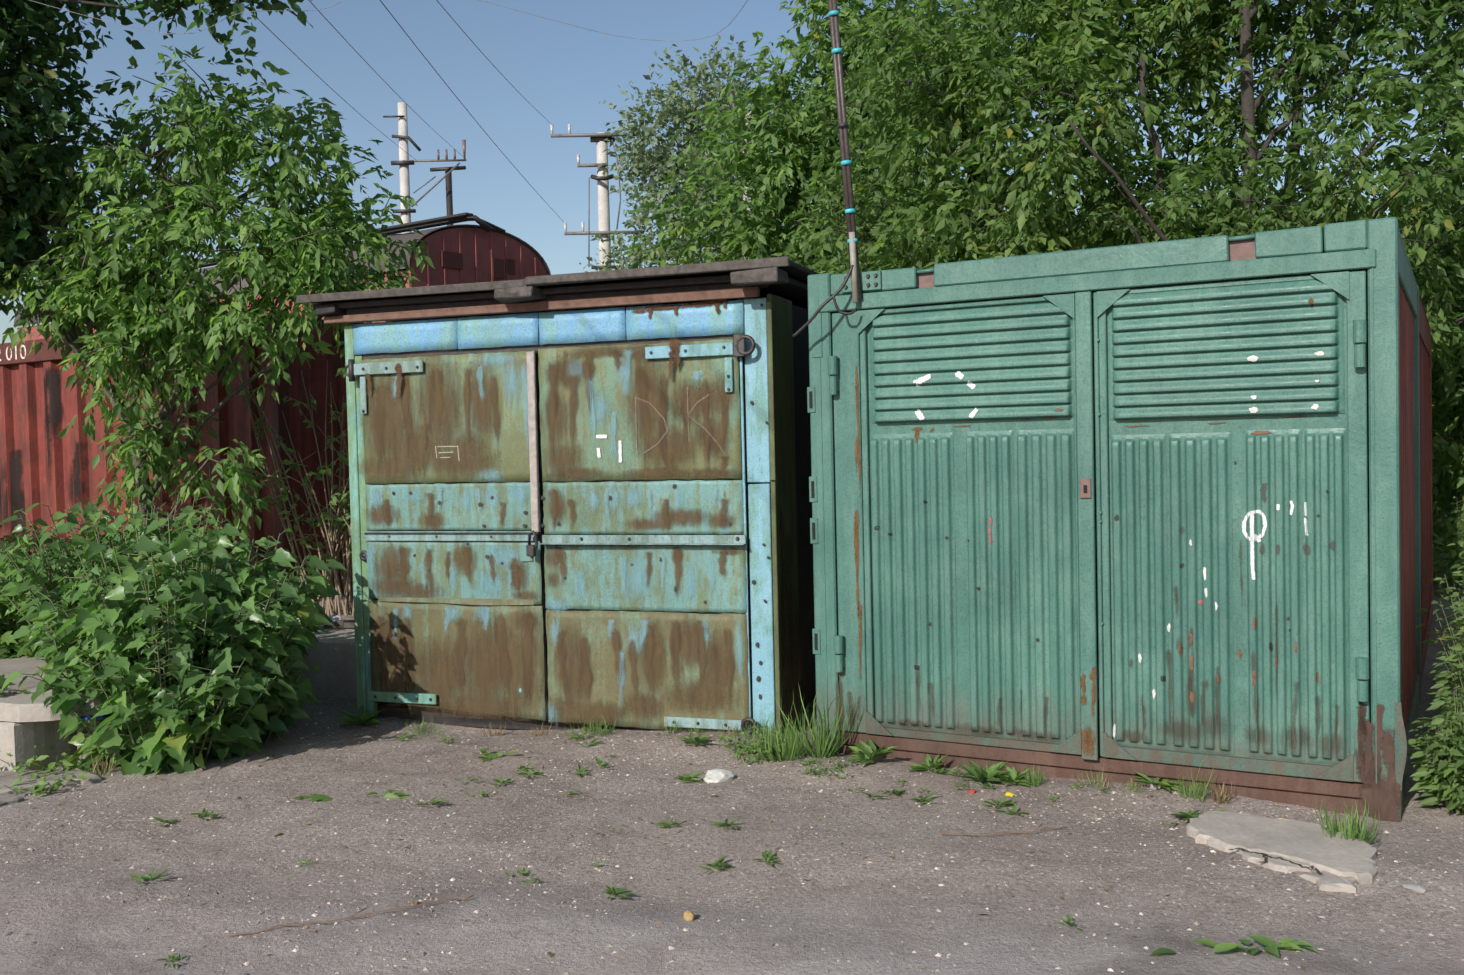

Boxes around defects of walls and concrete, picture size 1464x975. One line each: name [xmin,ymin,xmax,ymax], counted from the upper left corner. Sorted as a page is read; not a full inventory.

leakage [44,369,63,434]
corrosion [362,364,500,480]
corrosion [546,339,734,524]
leakage [0,450,22,504]
leakage [73,443,85,500]
corrosion [370,499,396,523]
corrosion [424,493,442,529]
corrosion [632,499,732,529]
corrosion [718,548,740,575]
corrosion [372,545,734,723]
corrosion [1357,705,1401,823]